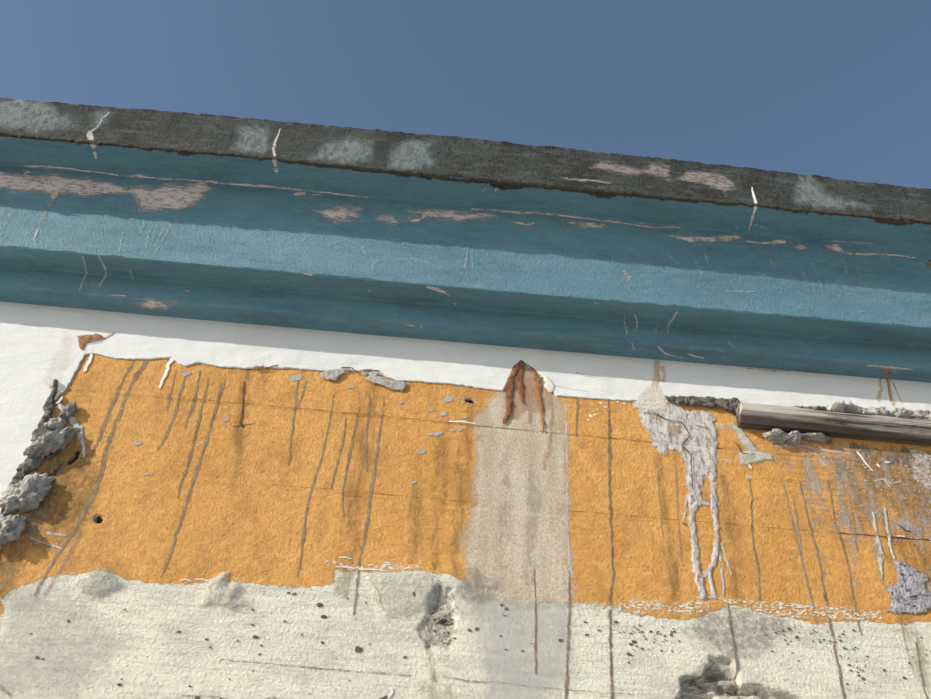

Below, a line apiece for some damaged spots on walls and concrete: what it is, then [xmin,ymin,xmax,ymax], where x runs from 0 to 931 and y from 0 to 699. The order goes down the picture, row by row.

peeling [0,165,368,222]
spalling [37,379,66,427]
spalling [320,367,406,413]
rust [502,360,555,467]
spalling [10,469,30,484]
damp [634,392,777,601]
peeling [323,555,420,571]
damp [460,366,579,699]
spalling [421,586,457,647]
peeling [576,599,709,664]
spalling [724,560,931,690]
spalling [682,656,780,699]